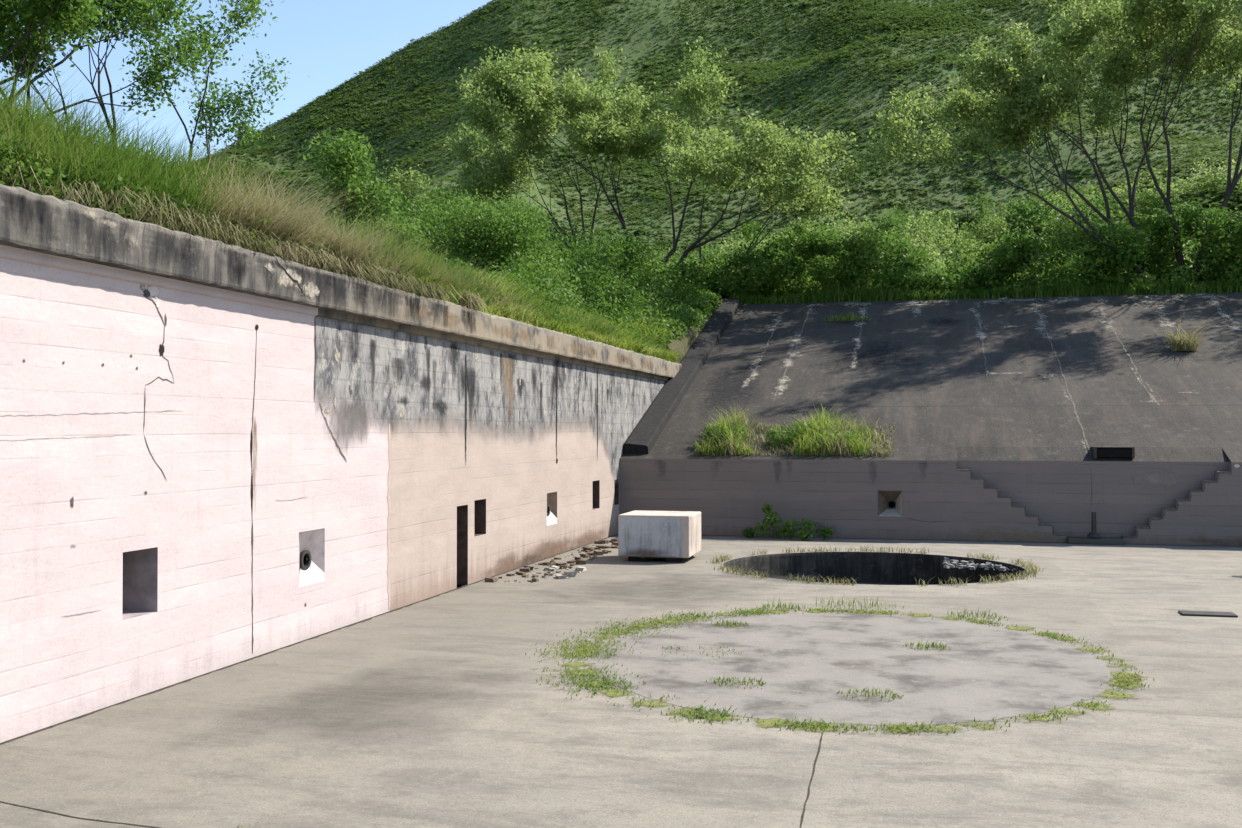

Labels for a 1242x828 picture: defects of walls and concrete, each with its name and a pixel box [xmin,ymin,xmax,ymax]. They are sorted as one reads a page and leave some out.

water stain [10,195,46,225]
water stain [77,210,137,244]
water stain [294,267,420,311]
crack [143,284,174,481]
water stain [337,405,367,437]
crack [249,331,257,653]